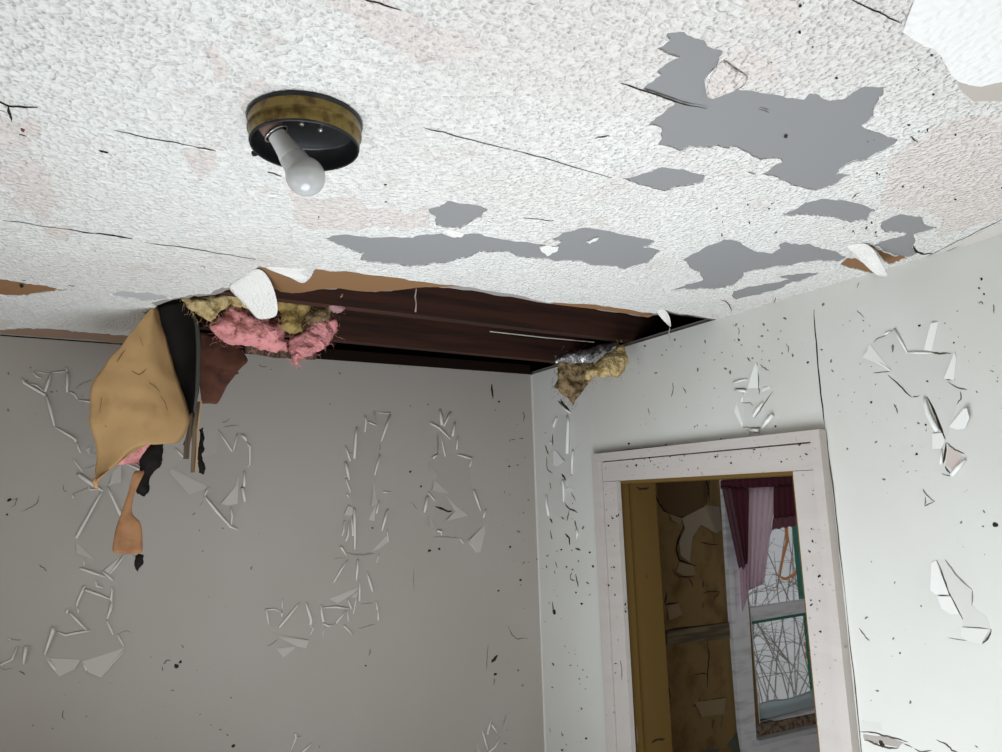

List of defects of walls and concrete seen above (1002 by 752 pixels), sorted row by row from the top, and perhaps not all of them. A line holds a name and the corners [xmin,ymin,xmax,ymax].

crack [0,101,38,137]
peeling [644,32,897,221]
peeling [626,167,704,190]
crack [3,220,256,268]
peeling [229,266,313,319]
peeling [328,201,659,268]
peeling [674,214,935,299]
crack [737,357,772,428]
crack [814,318,978,752]
crack [636,480,727,728]
peeling [930,559,991,644]
crack [937,561,991,644]